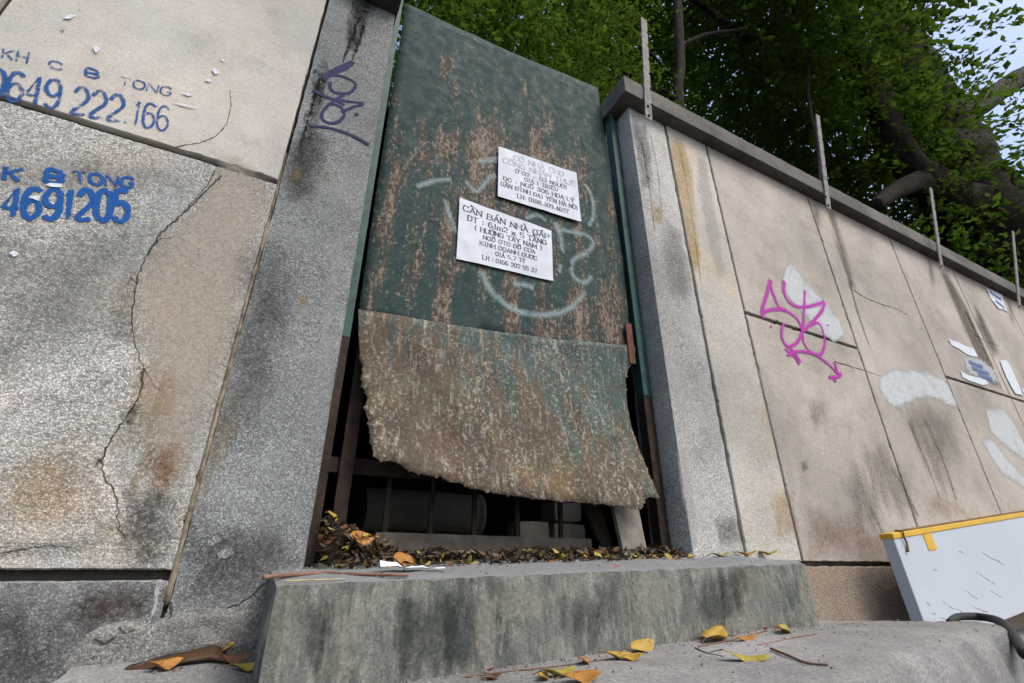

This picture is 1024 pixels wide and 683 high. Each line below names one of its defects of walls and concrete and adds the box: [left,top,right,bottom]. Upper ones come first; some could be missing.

damp [343,0,370,61]
crack [175,92,232,148]
crack [95,170,222,539]
crack [0,544,70,554]